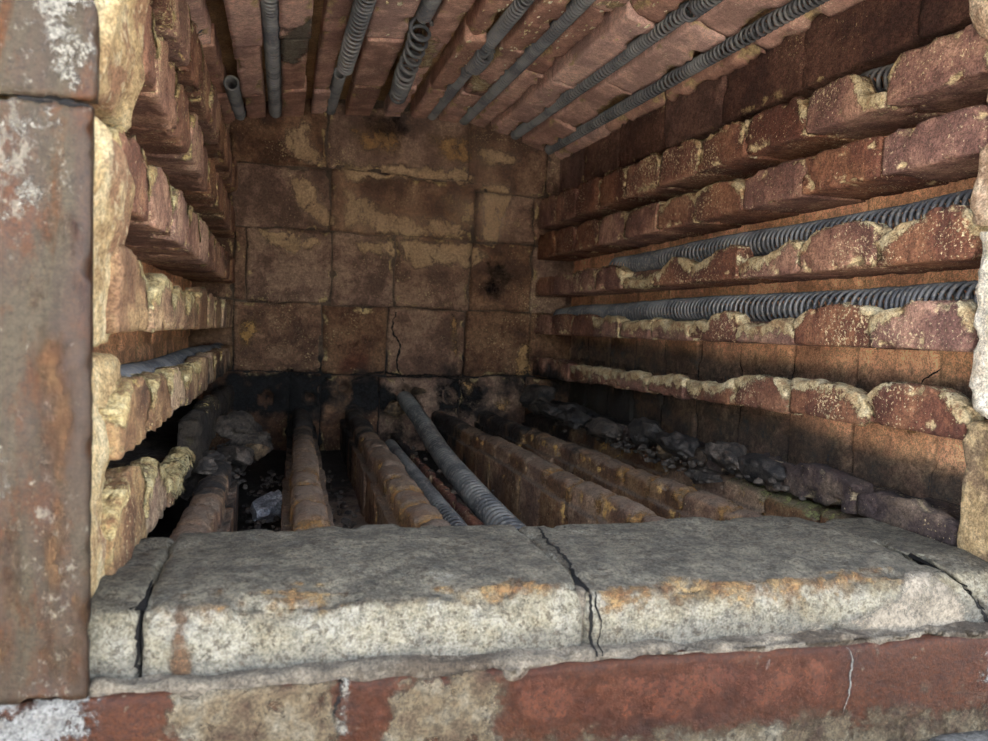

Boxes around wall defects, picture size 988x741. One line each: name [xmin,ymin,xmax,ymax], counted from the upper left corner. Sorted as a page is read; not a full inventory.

crack [351,312,462,382]
crack [129,579,154,674]
crack [538,527,603,657]
crack [901,553,988,622]
rust [514,648,848,730]